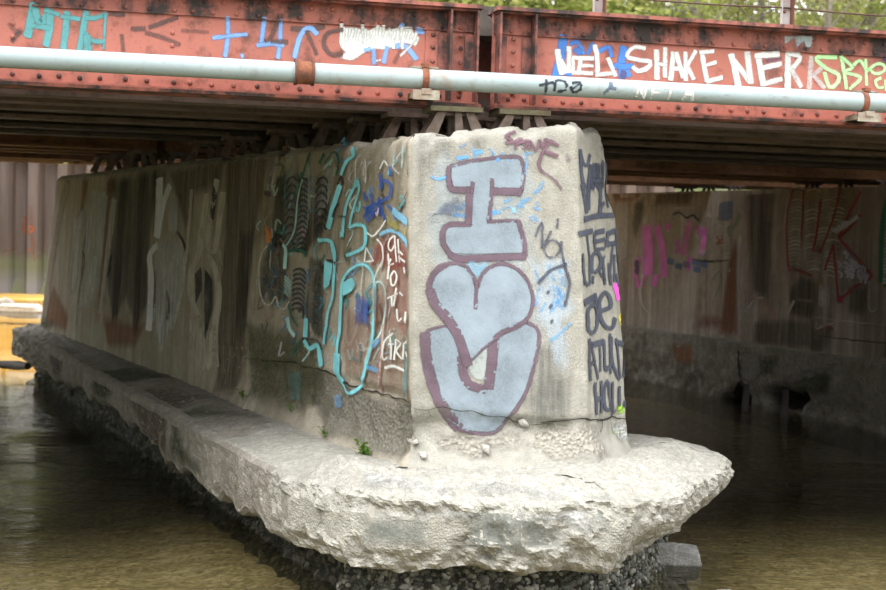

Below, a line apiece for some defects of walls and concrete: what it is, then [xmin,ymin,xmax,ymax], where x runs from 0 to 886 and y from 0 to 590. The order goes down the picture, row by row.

leakage [72,156,268,390]
crack [246,358,627,432]